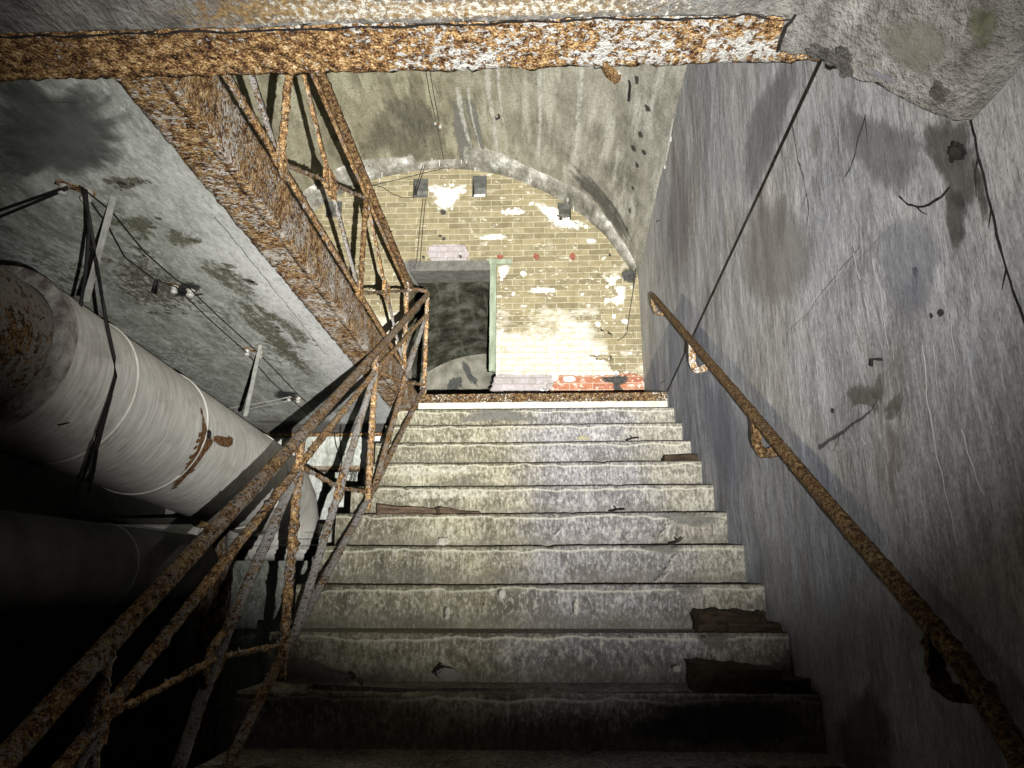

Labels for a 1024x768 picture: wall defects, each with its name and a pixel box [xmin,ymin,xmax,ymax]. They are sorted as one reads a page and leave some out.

spalling [805,43,854,78]
water stain [110,217,201,246]
water stain [174,283,203,297]
water stain [202,260,311,375]
peeling [295,146,644,394]
water stain [453,68,504,158]
water stain [573,67,585,162]
crack [845,114,870,176]
crack [899,186,950,215]
water stain [927,123,987,247]
crack [969,119,1024,323]
crack [818,400,878,451]